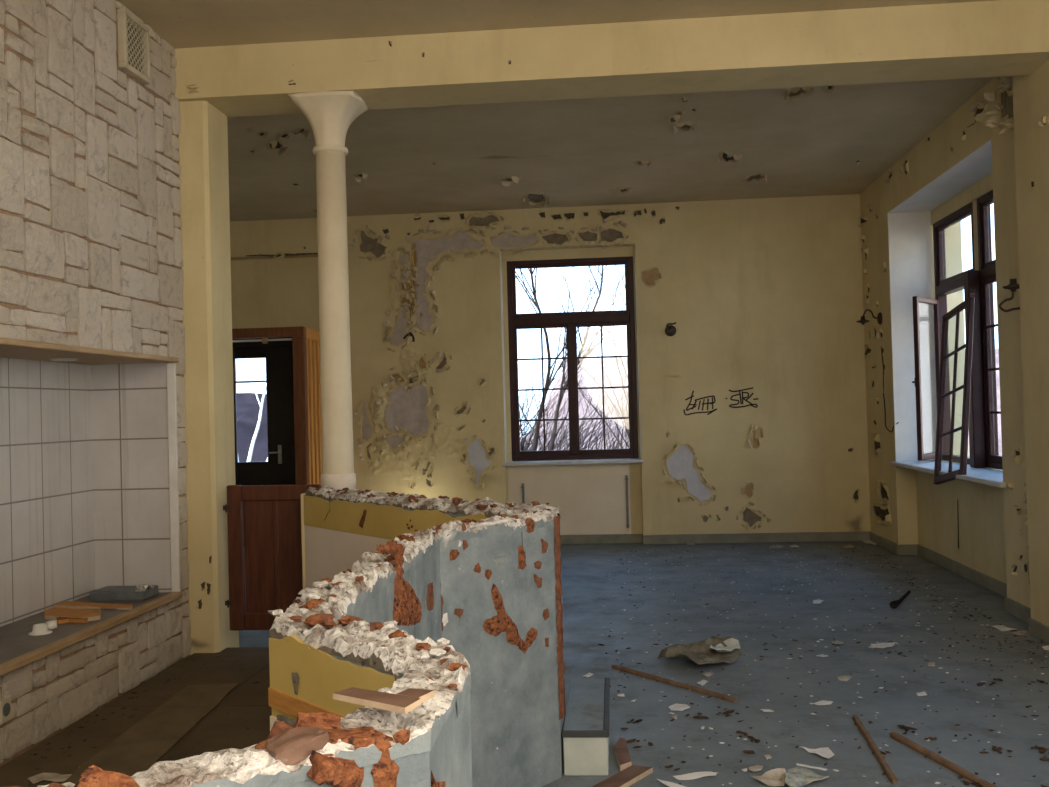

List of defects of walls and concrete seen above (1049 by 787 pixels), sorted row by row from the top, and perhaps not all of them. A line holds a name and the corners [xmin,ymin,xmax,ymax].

peeling [975,76,1014,134]
peeling [640,266,663,288]
peeling [349,208,636,492]
peeling [662,432,772,530]
flaking render [449,522,468,561]
flaking render [376,541,464,631]
flaking render [474,513,565,720]
spalling [291,672,299,695]
spalling [255,712,410,787]